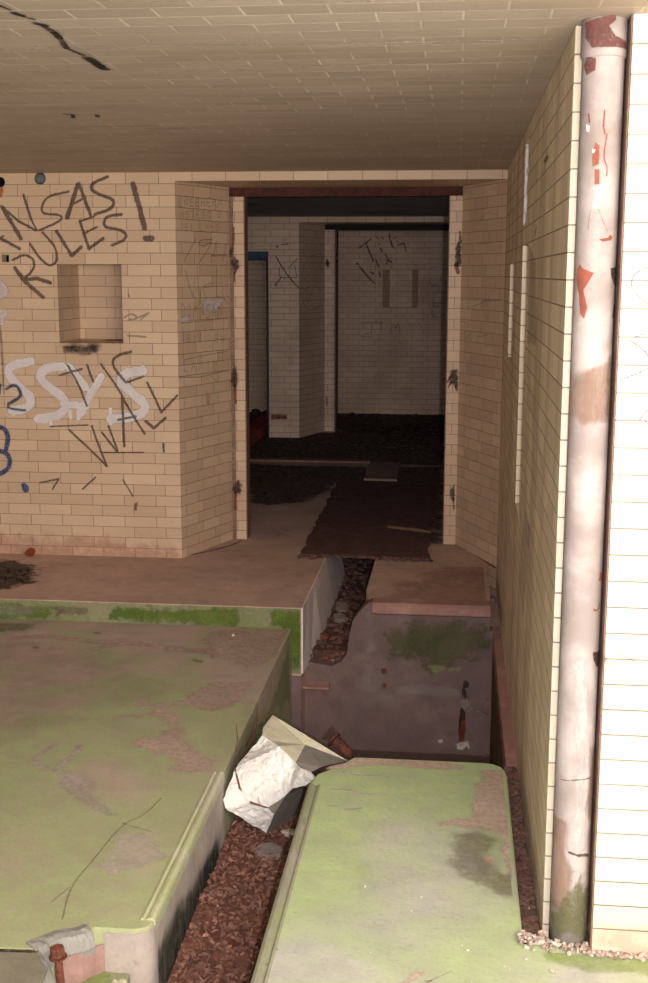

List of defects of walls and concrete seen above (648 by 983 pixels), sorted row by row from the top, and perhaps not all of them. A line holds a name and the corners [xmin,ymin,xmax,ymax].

peeling [584,15,627,75]
peeling [590,109,608,223]
peeling [576,265,594,318]
spalling [26,924,105,983]